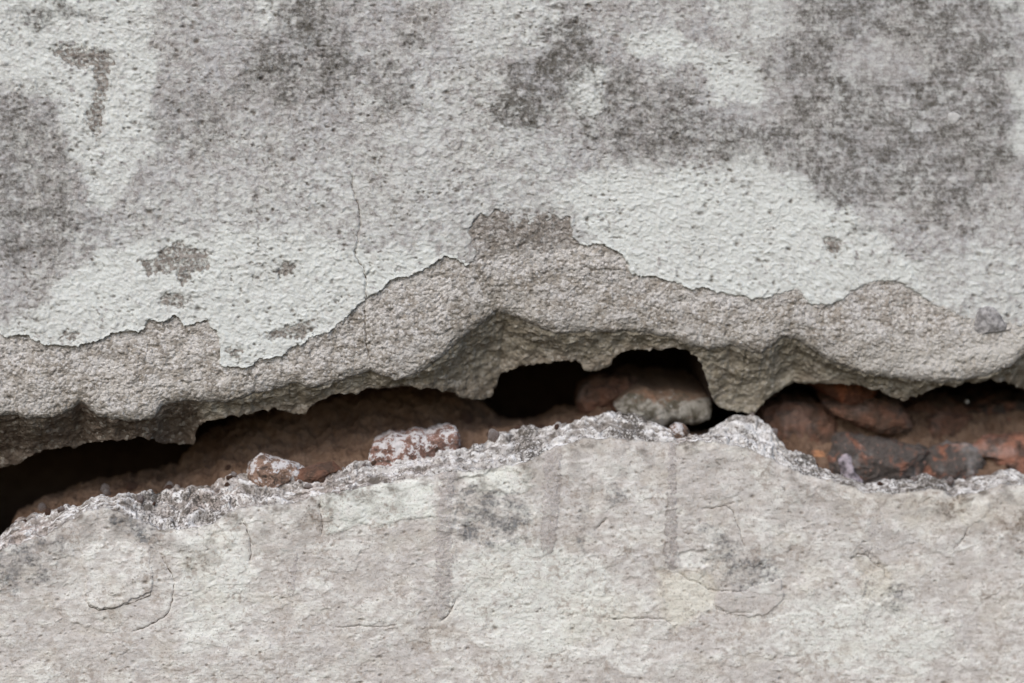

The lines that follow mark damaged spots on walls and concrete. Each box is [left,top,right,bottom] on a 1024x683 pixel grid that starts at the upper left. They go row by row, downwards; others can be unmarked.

damp [244,0,362,105]
damp [3,96,54,167]
damp [490,0,1021,225]
damp [1,182,77,251]
spalling [0,209,1024,421]
crack [0,174,1024,560]
flaking render [827,431,1024,484]